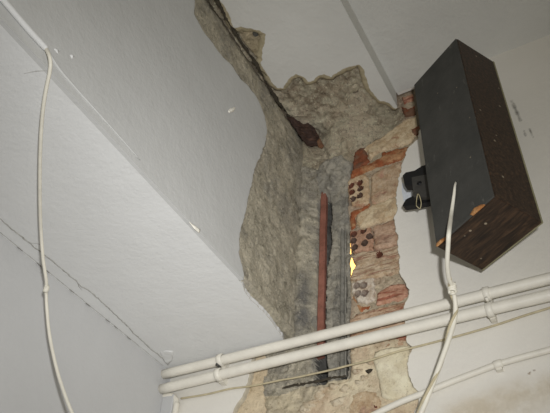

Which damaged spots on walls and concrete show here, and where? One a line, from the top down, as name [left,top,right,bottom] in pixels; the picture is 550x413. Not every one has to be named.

rust [286,113,324,149]
spalling [194,0,420,340]
crack [0,219,165,365]
peeling [233,335,419,413]